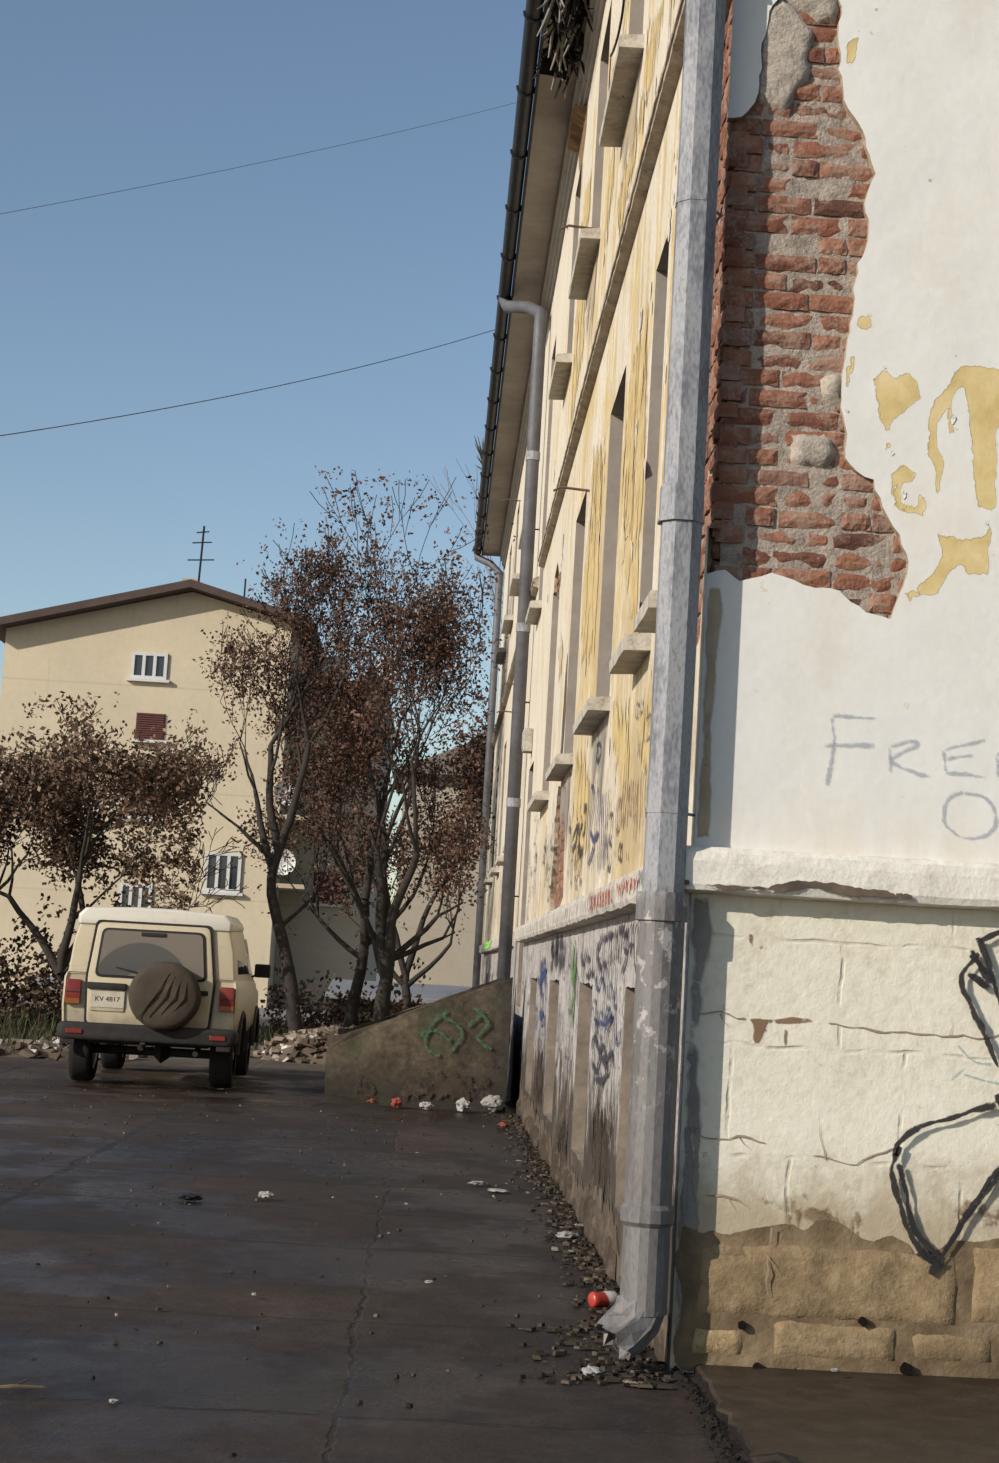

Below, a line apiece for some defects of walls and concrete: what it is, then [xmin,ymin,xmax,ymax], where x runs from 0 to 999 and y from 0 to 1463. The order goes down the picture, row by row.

peeling [580,0,674,268]
peeling [570,300,586,425]
peeling [621,191,677,625]
spalling [696,0,999,646]
peeling [553,434,604,909]
peeling [608,689,652,799]
damp [589,1104,612,1214]
damp [787,1206,860,1243]
damp [957,1202,999,1225]